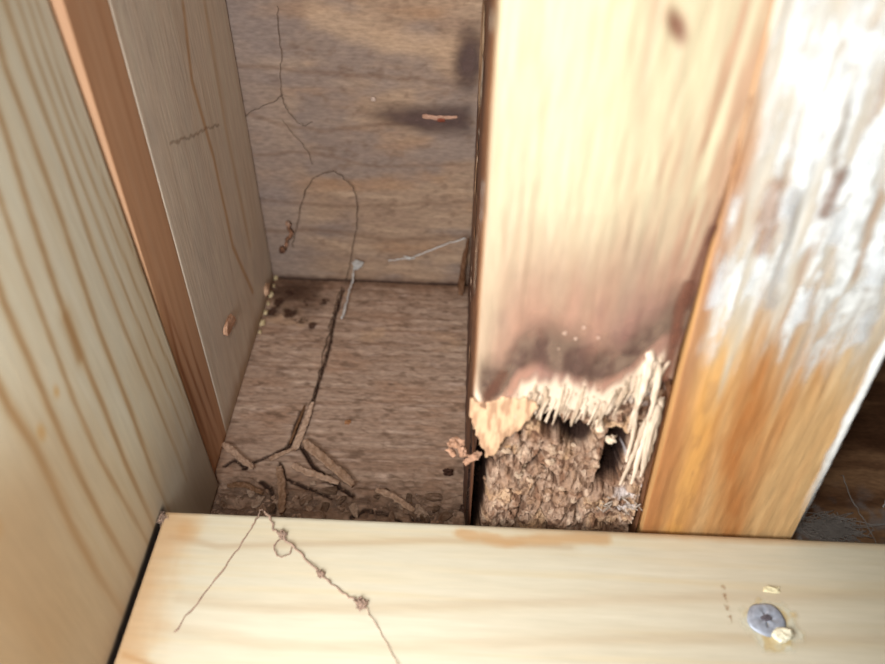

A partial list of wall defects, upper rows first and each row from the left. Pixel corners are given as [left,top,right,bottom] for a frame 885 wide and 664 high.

leakage [458,37,480,83]
peeling [478,2,493,118]
leakage [386,110,467,130]
leakage [479,227,717,402]
crack [223,290,430,523]